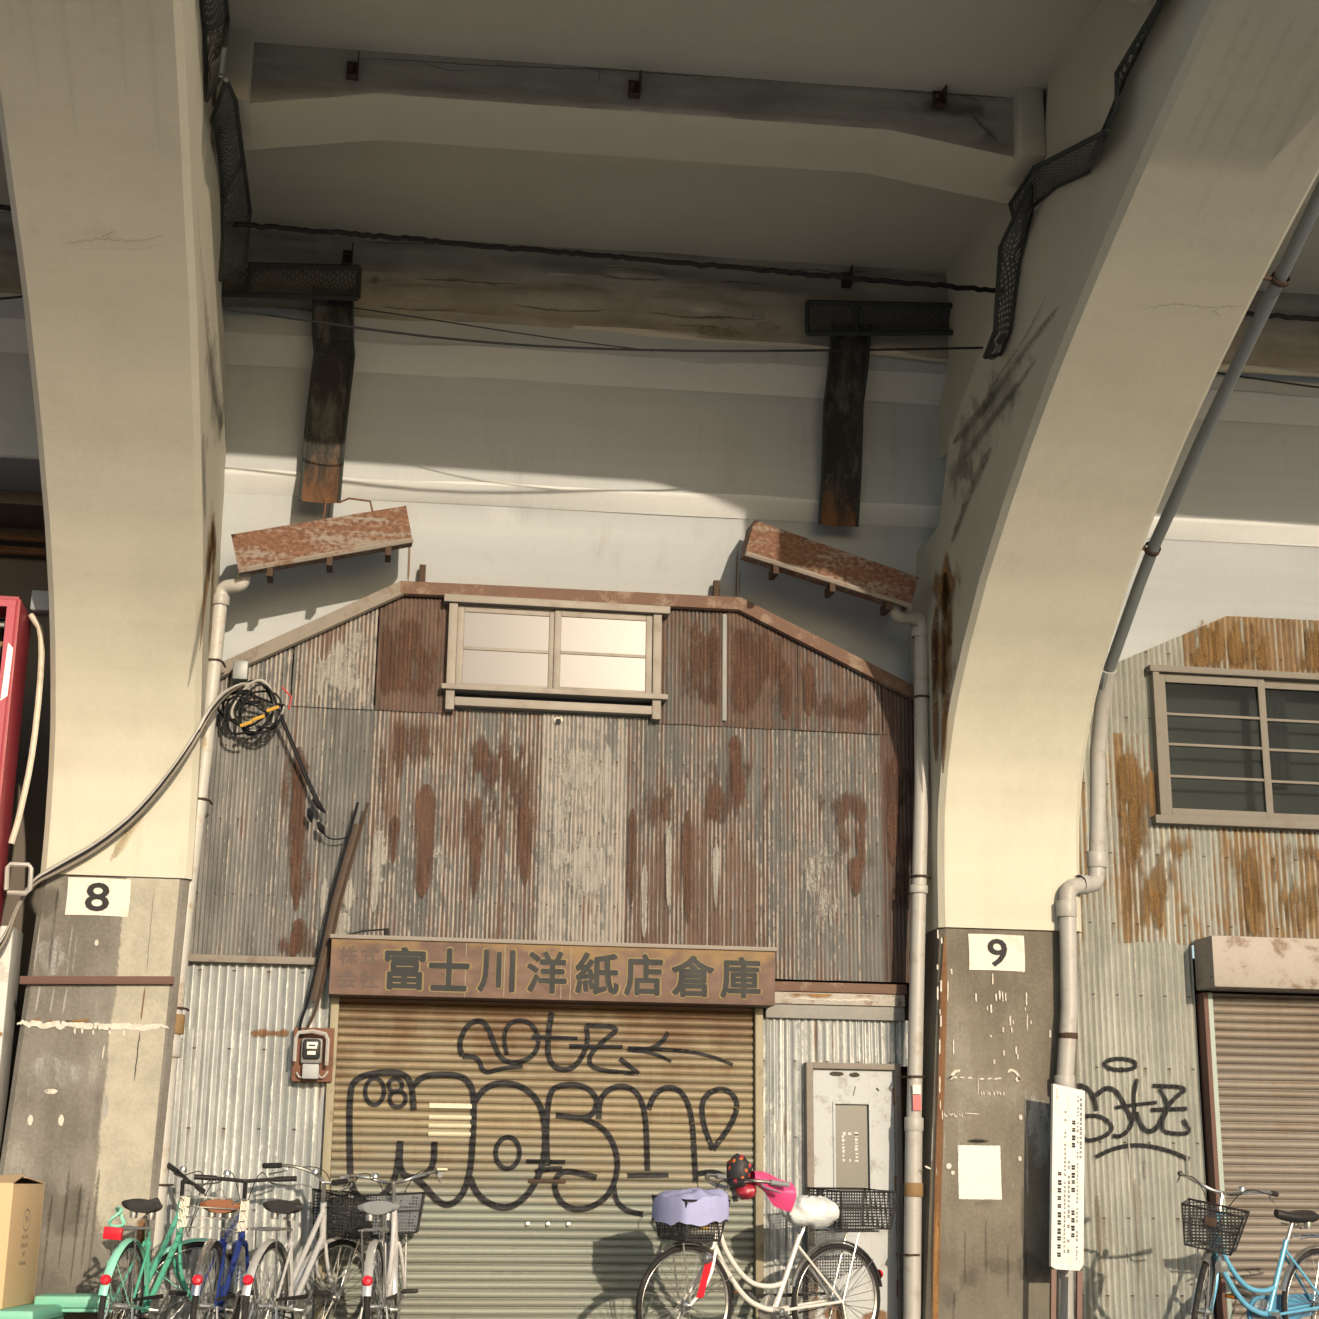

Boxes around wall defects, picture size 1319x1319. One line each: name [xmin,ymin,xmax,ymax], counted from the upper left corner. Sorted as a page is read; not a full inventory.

damp [951,308,1057,542]
rust [200,502,216,655]
rust [931,555,959,773]
rust [1194,620,1270,667]
rust [1302,628,1319,671]
rust [380,721,441,898]
rust [463,737,534,899]
rust [628,735,752,922]
rust [819,791,867,896]
rust [1119,752,1190,930]